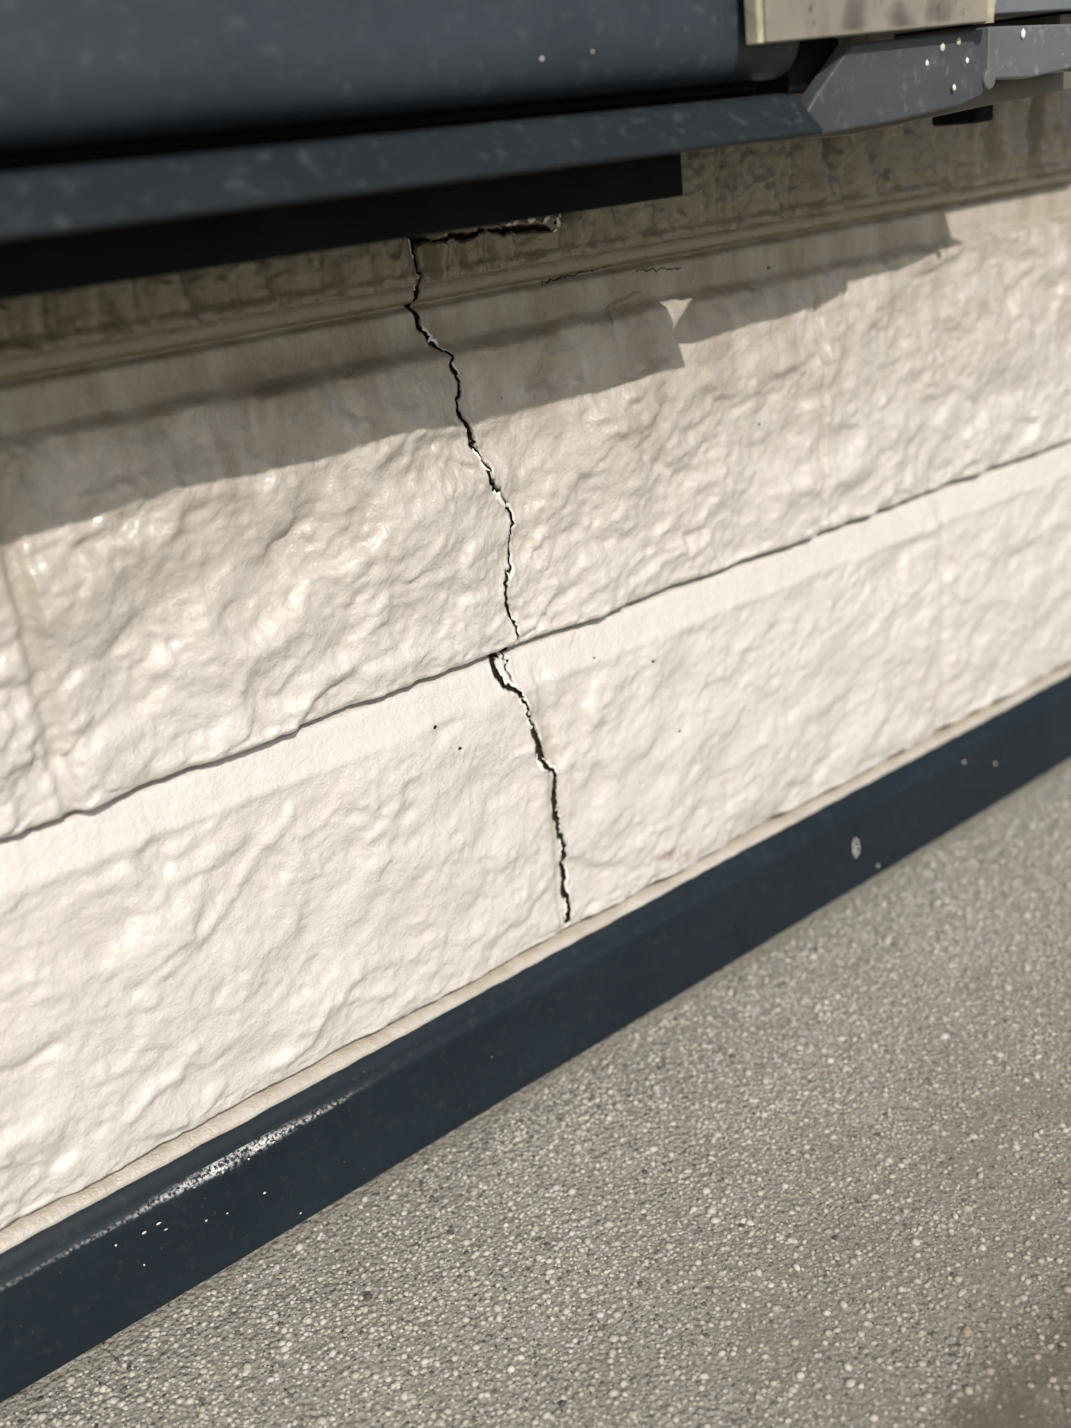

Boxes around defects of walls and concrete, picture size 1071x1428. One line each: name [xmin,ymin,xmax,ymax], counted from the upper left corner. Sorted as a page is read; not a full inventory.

crack [405,214,571,923]